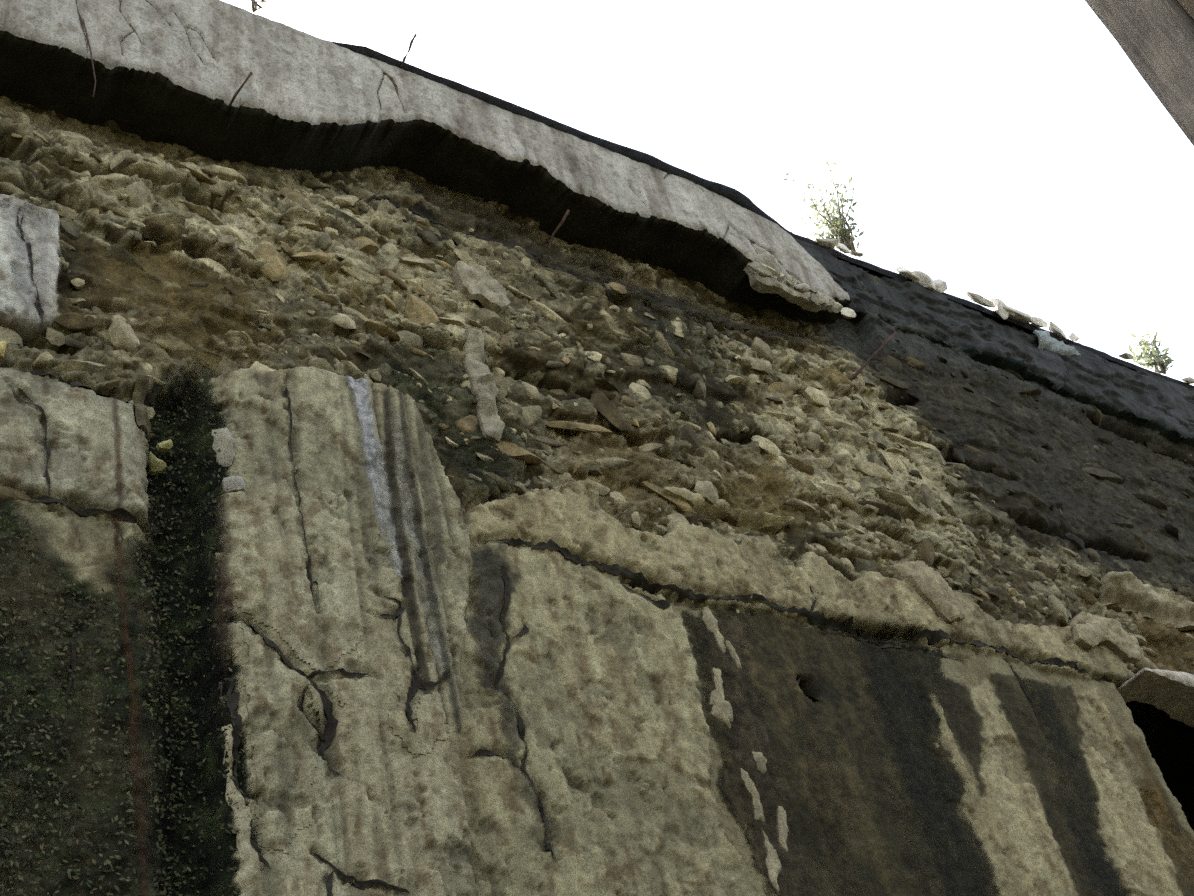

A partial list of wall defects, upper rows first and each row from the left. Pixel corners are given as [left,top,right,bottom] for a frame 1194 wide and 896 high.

crack [17,206,44,321]
crack [0,365,170,544]
rust [113,397,137,751]
crack [219,678,271,870]
crack [218,620,376,775]
crack [284,372,316,610]
crack [371,596,450,732]
spalling [0,96,1194,675]
crack [469,538,1112,858]
water stain [682,609,997,896]
spalling [1126,701,1194,831]
crack [313,853,410,896]